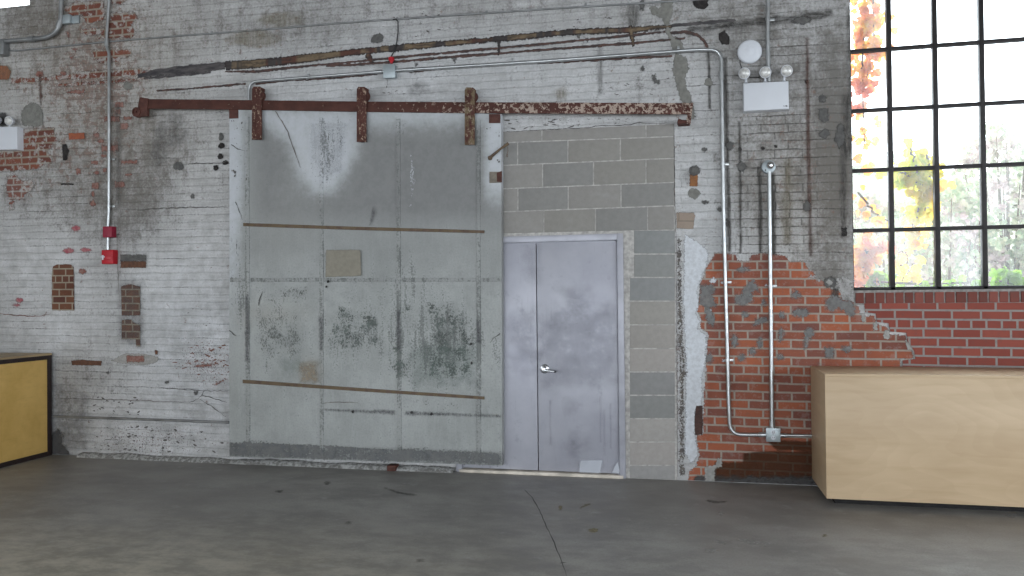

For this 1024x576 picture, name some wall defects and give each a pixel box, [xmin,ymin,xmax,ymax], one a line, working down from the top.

flaking render [0,102,137,210]
flaking render [52,248,91,311]
flaking render [121,284,158,363]
flaking render [675,212,913,480]
crack [525,490,567,576]